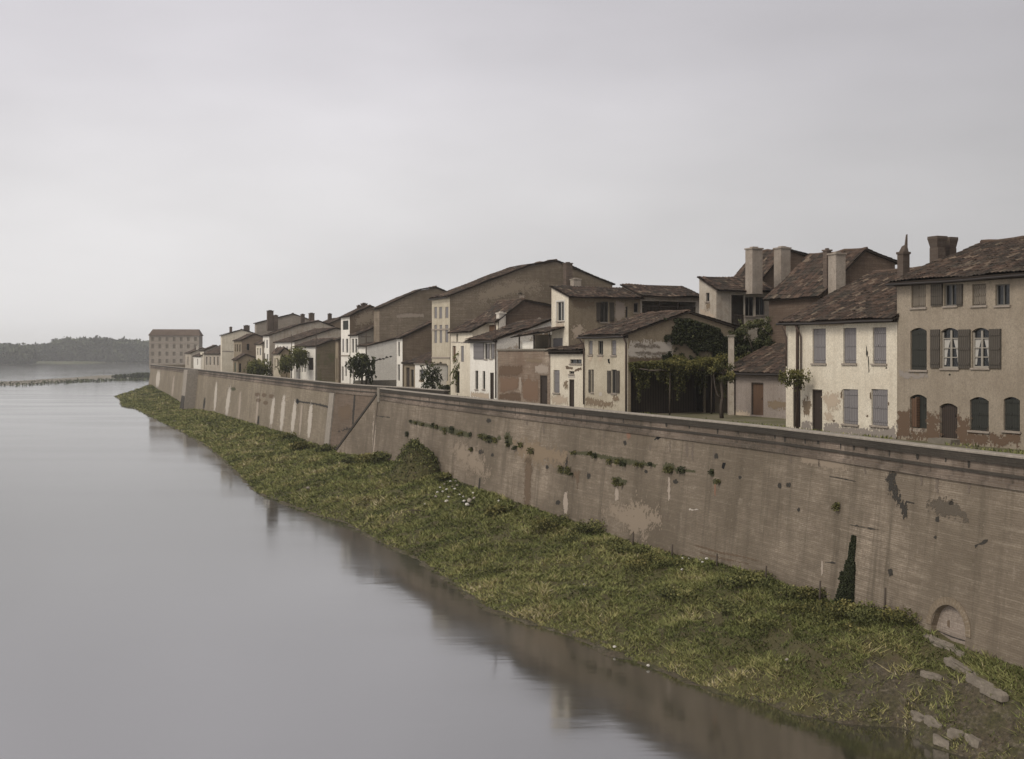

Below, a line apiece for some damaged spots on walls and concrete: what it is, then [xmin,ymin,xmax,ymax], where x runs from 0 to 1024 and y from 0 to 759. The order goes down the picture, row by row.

flaking render [888,402,1022,449]
peeling [601,490,662,543]